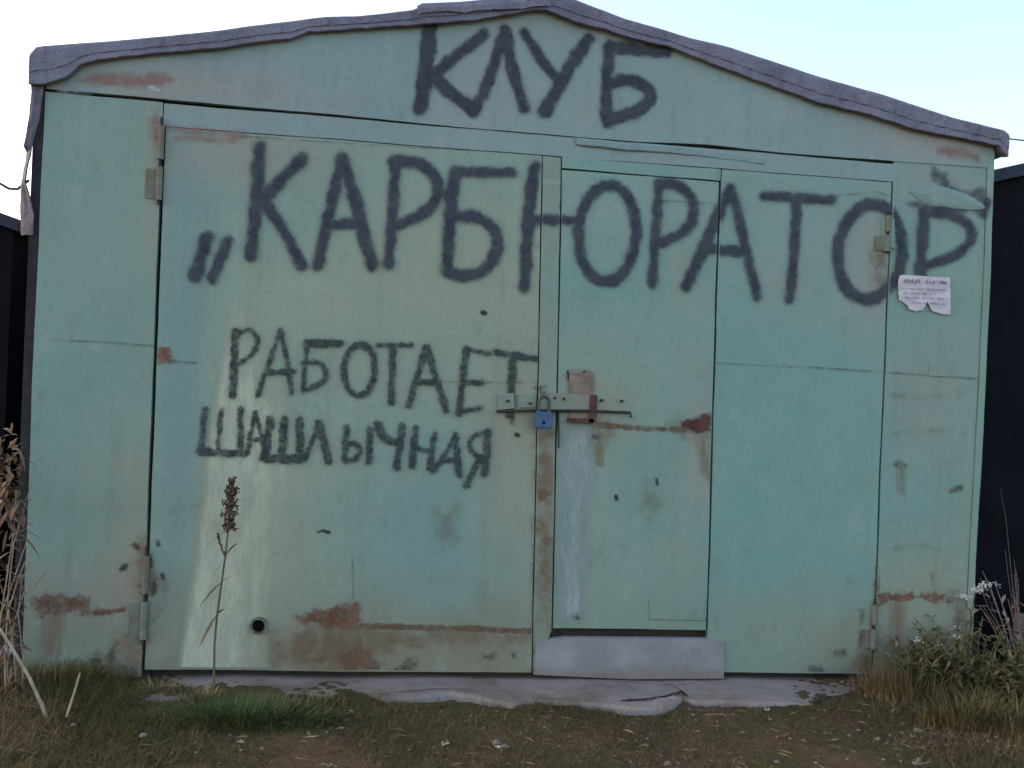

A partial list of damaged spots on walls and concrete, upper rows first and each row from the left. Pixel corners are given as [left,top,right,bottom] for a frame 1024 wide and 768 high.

rust [157,347,172,364]
rust [591,413,711,465]
rust [31,593,125,618]
rust [874,567,965,623]
rust [297,602,531,670]